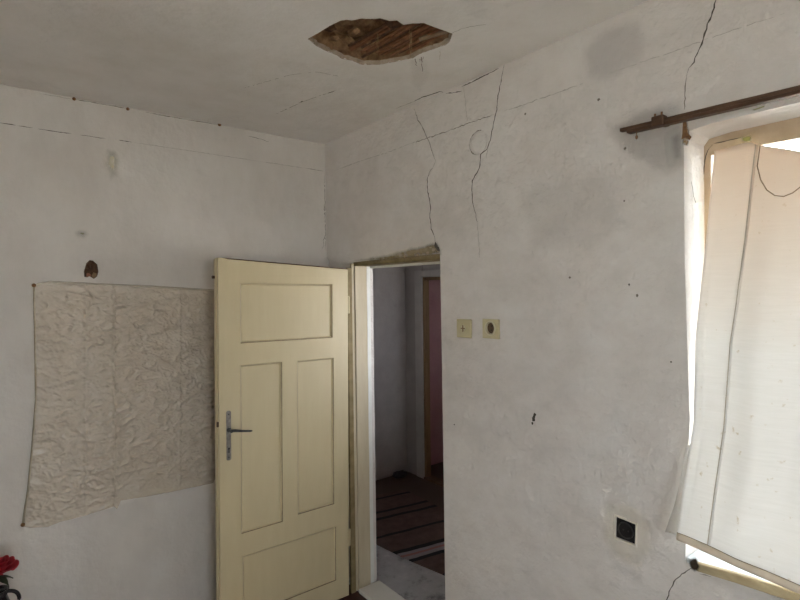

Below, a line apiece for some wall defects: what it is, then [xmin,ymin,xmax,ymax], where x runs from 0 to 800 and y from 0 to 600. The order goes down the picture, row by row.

crack [612,0,784,109]
crack [3,67,583,257]
spalling [84,260,98,279]